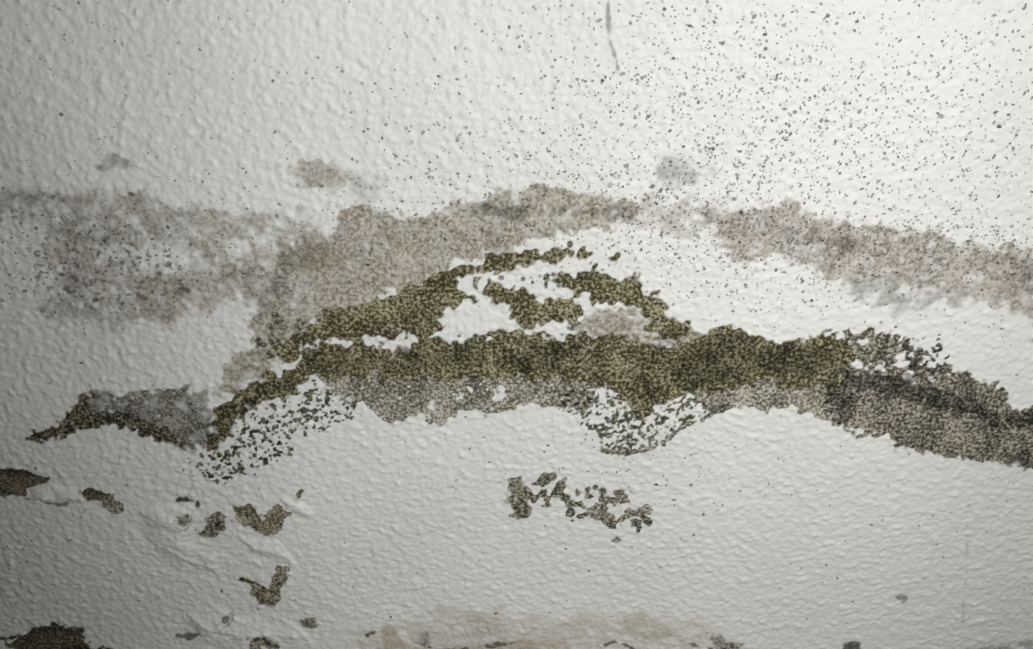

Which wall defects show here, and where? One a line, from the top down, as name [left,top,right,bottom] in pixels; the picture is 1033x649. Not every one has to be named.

damp [10,87,1033,484]
peeling [0,468,49,497]
peeling [82,488,123,514]
peeling [176,497,292,538]
peeling [239,565,289,607]
peeling [0,622,110,649]